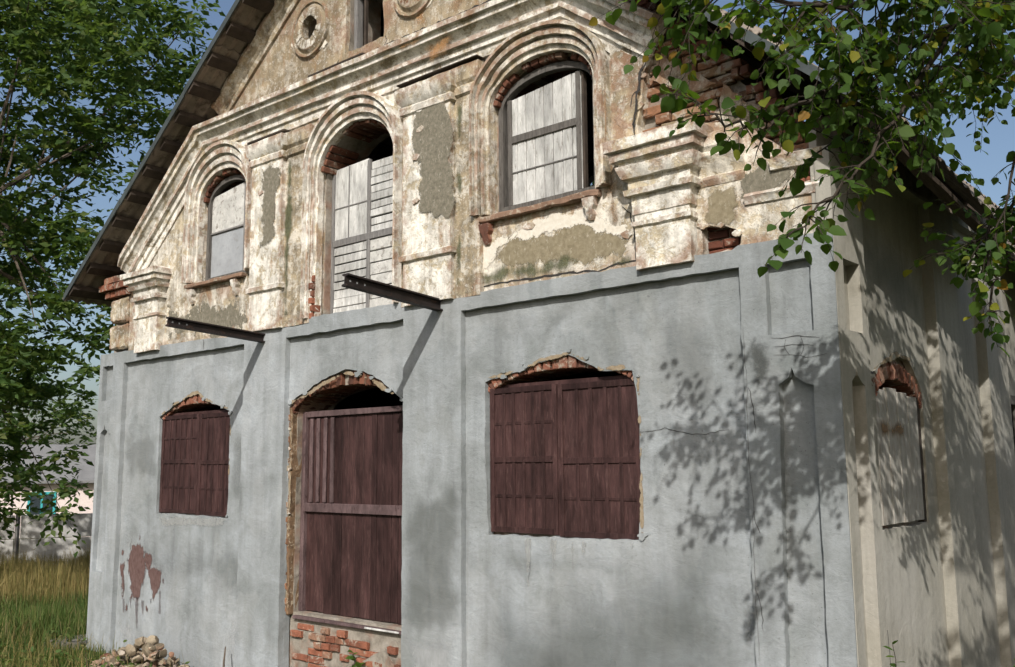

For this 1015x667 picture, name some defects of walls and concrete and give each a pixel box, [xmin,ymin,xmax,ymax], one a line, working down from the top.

flaking render [628,0,809,151]
peeling [412,92,455,218]
peeling [483,208,632,269]
peeling [697,165,815,254]
flaking render [159,391,233,416]
flaking render [288,370,403,405]
flaking render [489,348,590,379]
damp [752,346,766,378]
crack [777,335,827,358]
flaking render [637,473,649,541]
crack [743,337,764,641]